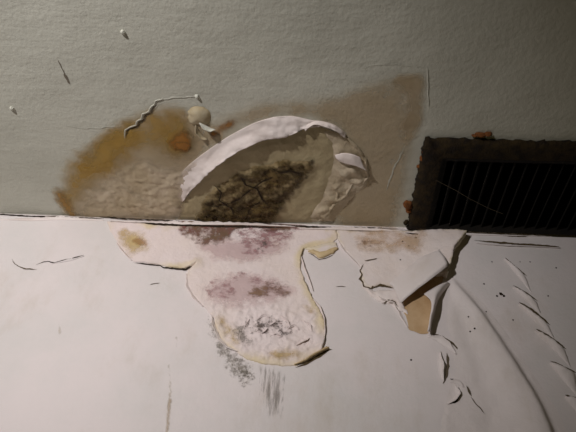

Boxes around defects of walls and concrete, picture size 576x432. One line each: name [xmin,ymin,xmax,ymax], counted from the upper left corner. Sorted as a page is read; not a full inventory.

leakage [56,116,223,216]
leakage [319,77,421,233]
crack [0,214,403,231]
leakage [121,230,145,250]
leakage [179,221,297,259]
crack [466,232,560,248]
crack [12,255,84,270]
peeling [107,116,484,413]
leakage [209,273,289,300]